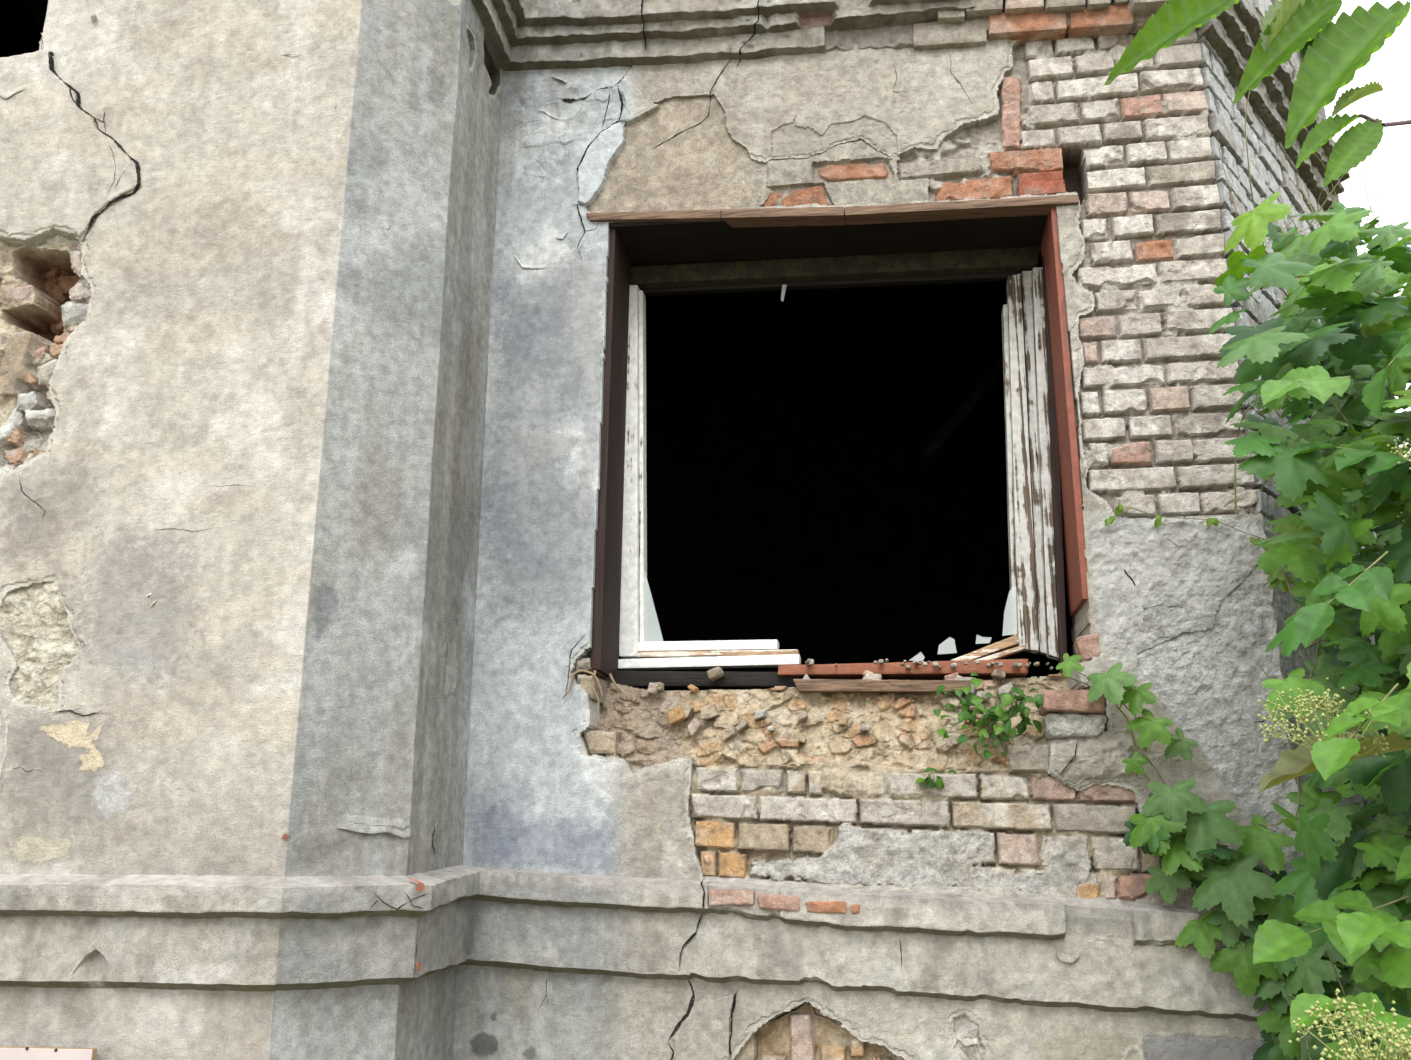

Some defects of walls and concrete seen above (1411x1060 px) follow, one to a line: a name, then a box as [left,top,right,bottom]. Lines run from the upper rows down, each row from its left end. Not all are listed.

crack [41,37,141,241]
crack [558,0,647,260]
crack [654,0,759,148]
flaking render [0,234,91,472]
flaking render [576,28,1257,519]
spalling [0,580,105,772]
flaking render [1074,633,1100,663]
flaking render [575,658,1164,914]
crack [668,879,705,1060]
crack [729,993,838,1055]
flaking render [672,994,905,1060]